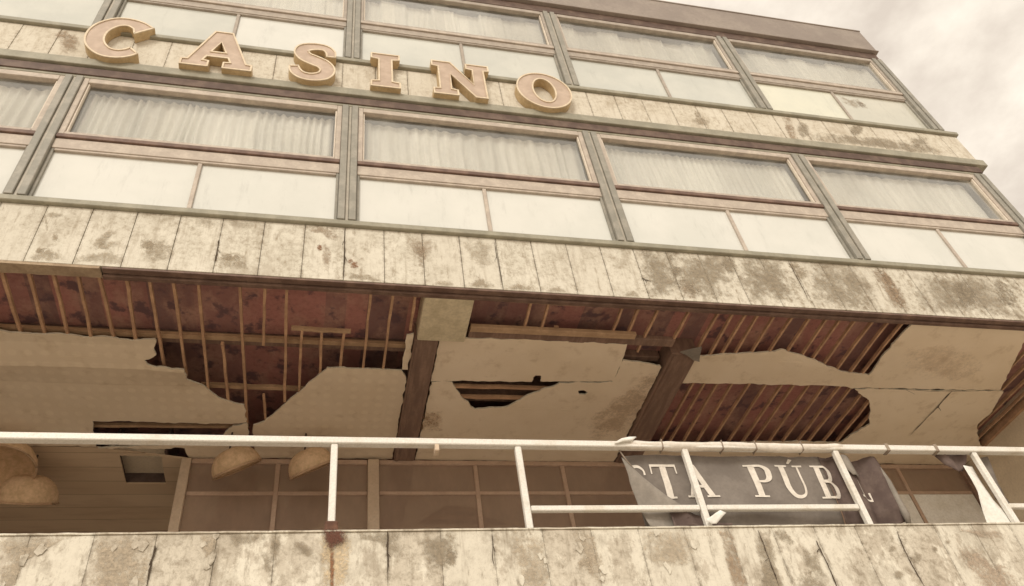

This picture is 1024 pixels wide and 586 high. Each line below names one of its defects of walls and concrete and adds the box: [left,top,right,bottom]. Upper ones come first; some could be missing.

leakage [821,126,932,152]
leakage [643,251,905,308]
leakage [920,278,1016,314]
crack [898,389,950,431]
leakage [232,534,280,571]
rust [322,530,349,586]
leakage [425,534,458,568]
leakage [719,532,746,586]
leakage [757,530,791,586]
leakage [803,553,824,586]
leakage [962,552,1012,586]